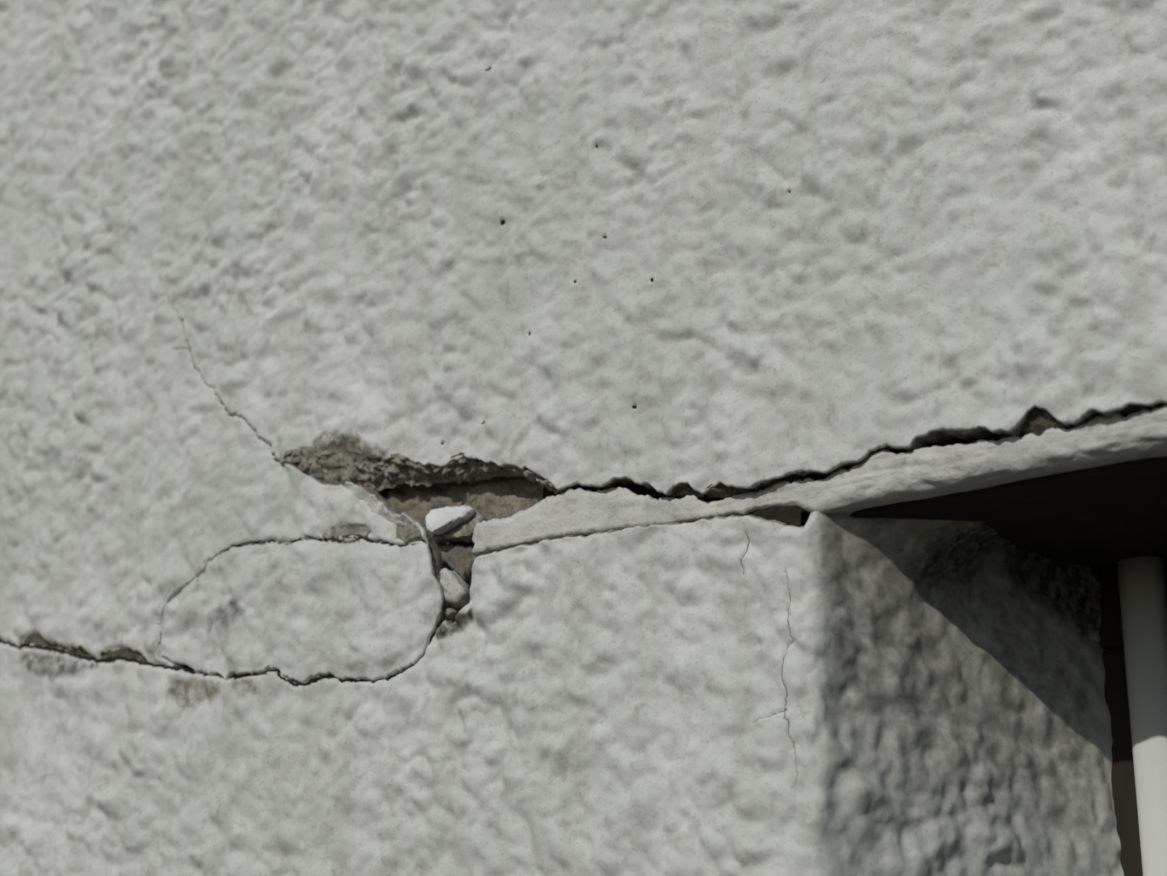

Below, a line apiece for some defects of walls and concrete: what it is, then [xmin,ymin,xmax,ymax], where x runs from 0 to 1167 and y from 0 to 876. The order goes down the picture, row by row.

crack [166,295,285,467]
spalling [280,435,562,544]
crack [543,487,597,499]
crack [625,476,827,574]
crack [928,437,1002,447]
crack [0,534,426,686]